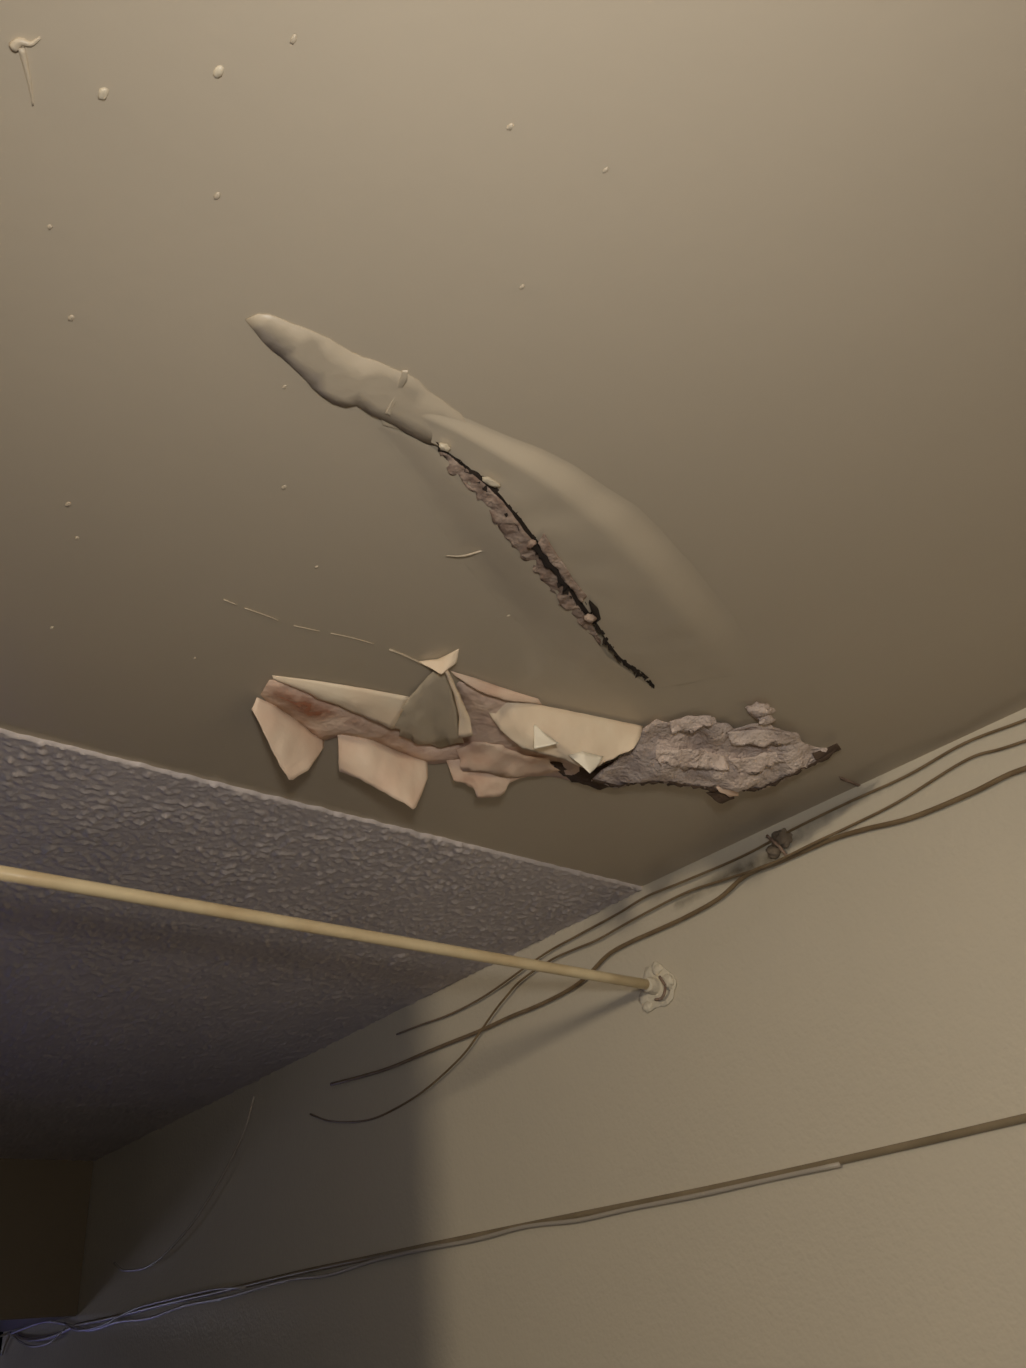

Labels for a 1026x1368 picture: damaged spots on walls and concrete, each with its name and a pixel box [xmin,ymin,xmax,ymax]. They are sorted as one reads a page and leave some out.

crack [436,442,655,688]
peeling [252,649,841,810]